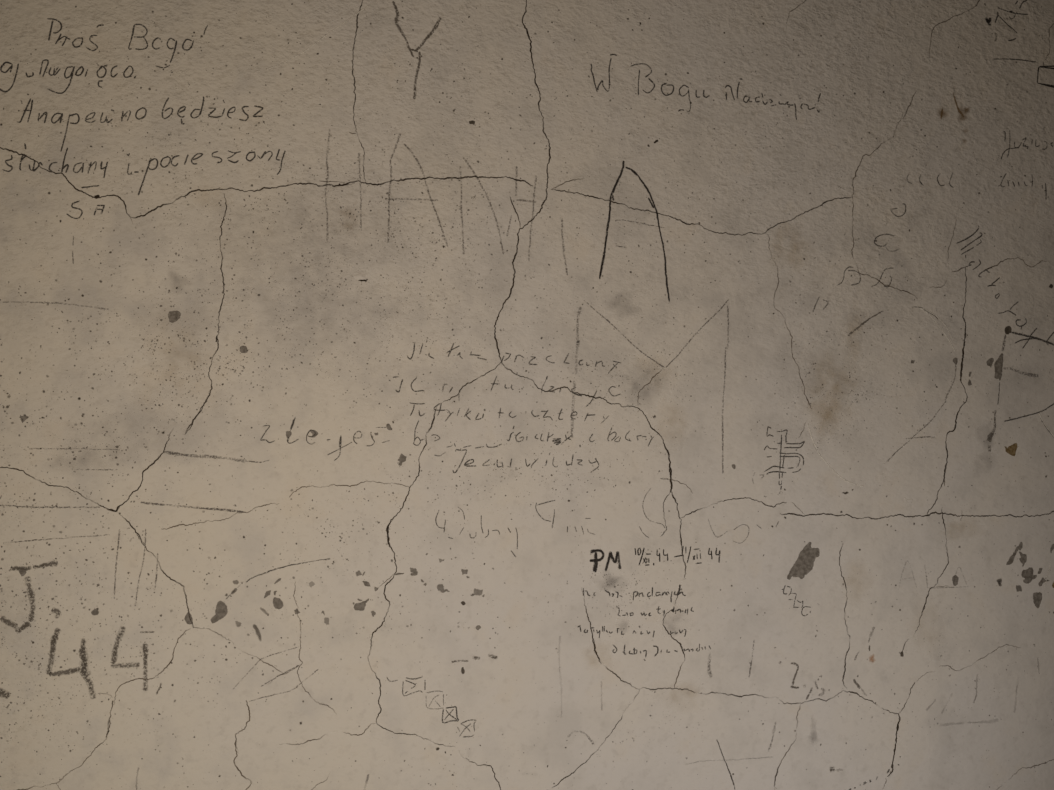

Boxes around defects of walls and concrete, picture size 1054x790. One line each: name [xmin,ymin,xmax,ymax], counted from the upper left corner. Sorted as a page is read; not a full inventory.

crack [0,0,913,706]
crack [724,232,1054,652]
crack [17,571,193,790]
crack [234,701,250,790]
crack [349,677,416,736]
spalling [787,541,820,580]
crack [783,547,915,784]
spalling [997,542,1054,614]